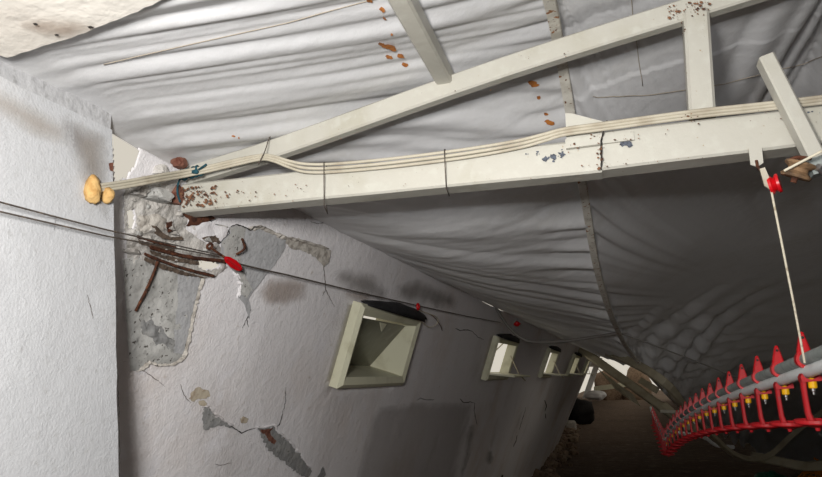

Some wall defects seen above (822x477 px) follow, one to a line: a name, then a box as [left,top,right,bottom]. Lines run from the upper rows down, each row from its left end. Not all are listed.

corrosion [667,1,711,34]
corrosion [378,33,408,67]
spalling [147,180,178,192]
corrosion [180,181,256,208]
spalling [123,187,331,372]
spalling [189,387,248,430]
crack [114,385,122,476]
spalling [256,424,326,477]